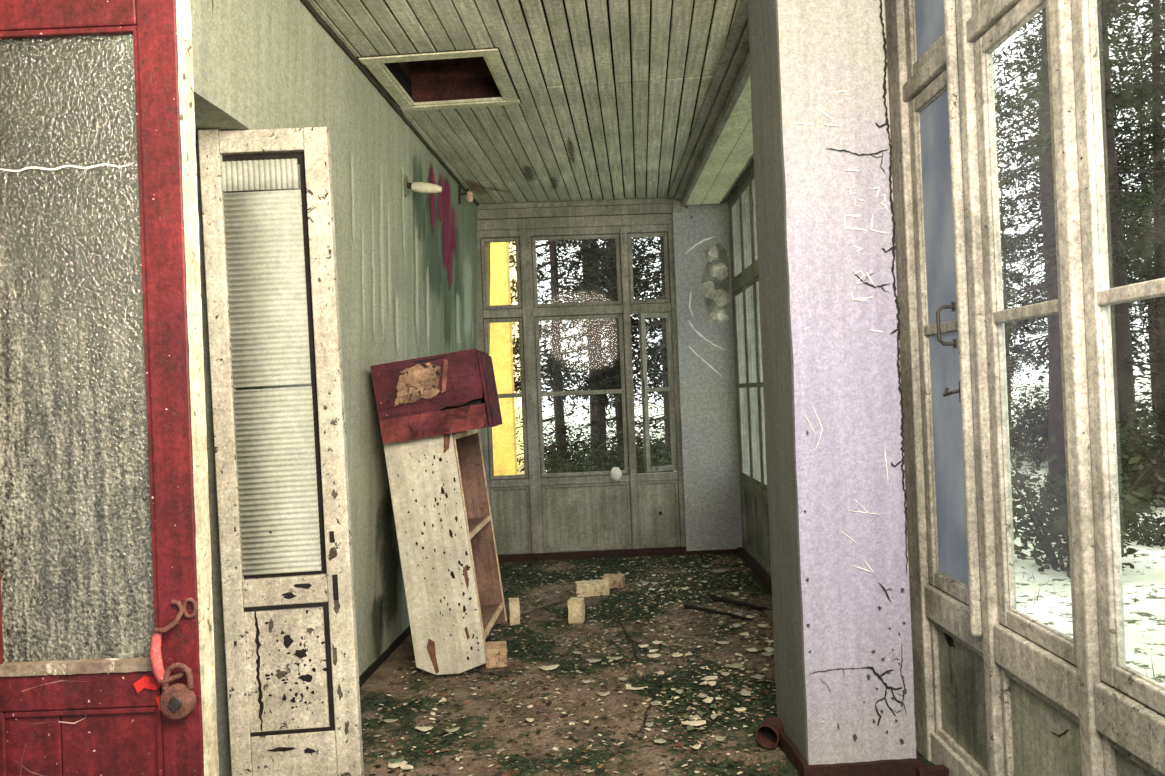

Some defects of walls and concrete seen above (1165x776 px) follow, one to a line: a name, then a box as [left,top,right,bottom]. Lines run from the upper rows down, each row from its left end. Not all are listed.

crack [827,0,908,601]
crack [811,644,906,726]